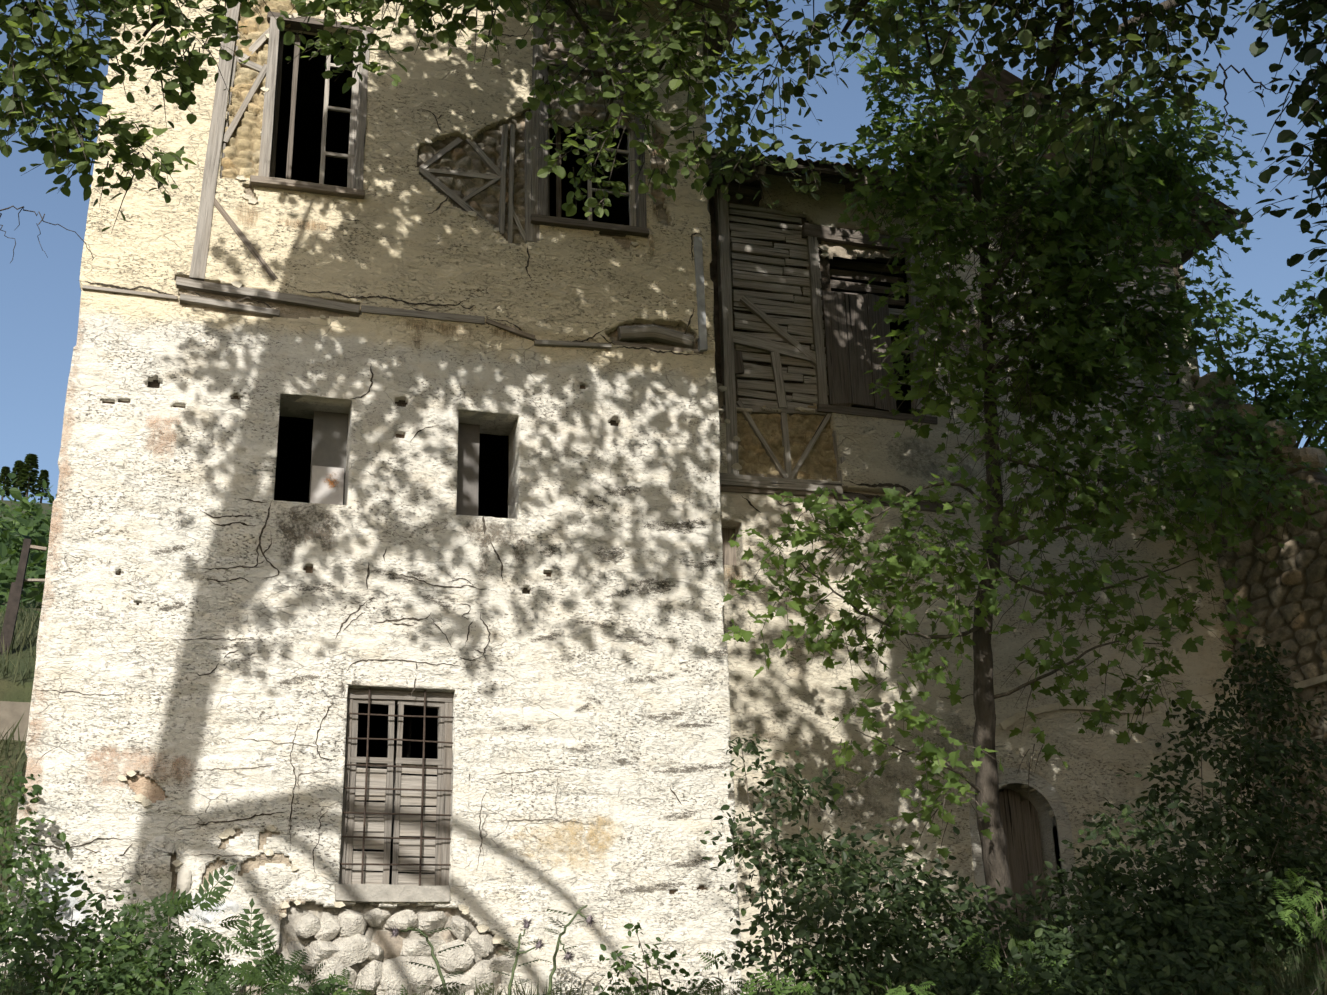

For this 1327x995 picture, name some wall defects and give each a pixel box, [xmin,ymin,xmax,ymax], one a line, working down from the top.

flaking render [221,0,301,205]
flaking render [417,0,635,244]
crack [78,280,537,340]
flaking render [607,175,904,499]
crack [193,498,280,583]
leakage [276,506,337,564]
leakage [466,519,526,574]
crack [335,515,503,695]
crack [171,638,265,676]
crack [184,703,336,877]
flaking render [167,852,182,908]
flaking render [196,825,299,891]